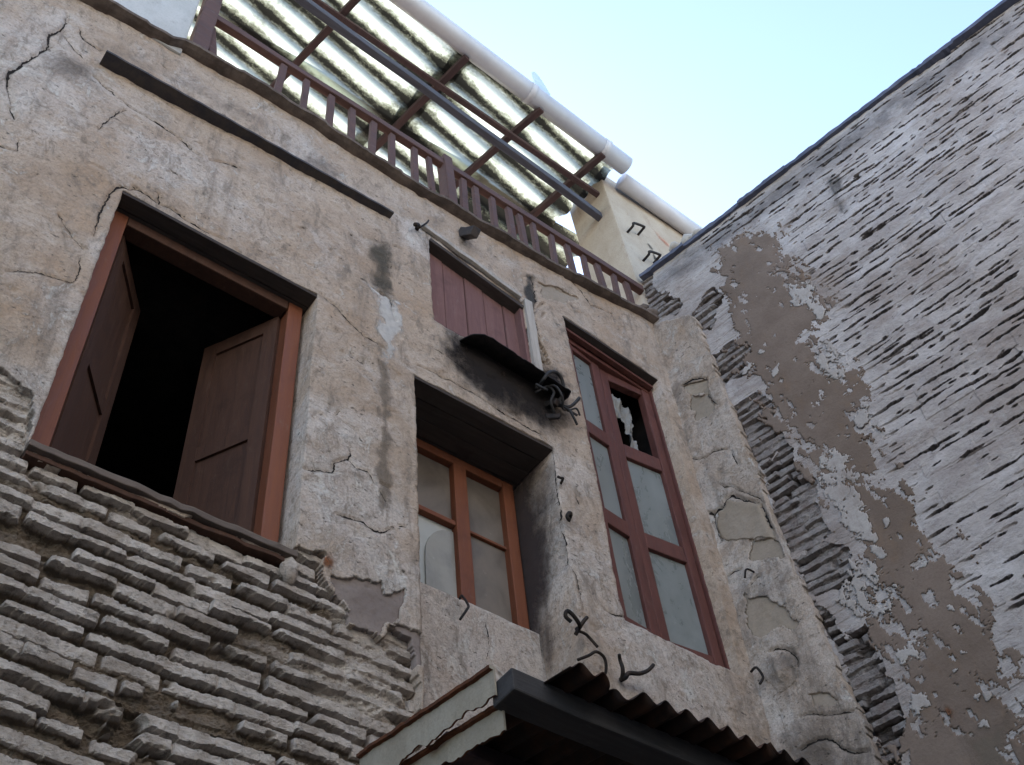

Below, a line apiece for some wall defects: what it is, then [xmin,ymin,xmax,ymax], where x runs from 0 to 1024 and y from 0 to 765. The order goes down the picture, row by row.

crack [0,17,99,151]
crack [14,186,209,283]
water stain [370,245,402,508]
flaking render [0,374,421,765]
crack [308,452,386,502]
crack [337,514,403,533]
peeling [641,222,1024,765]